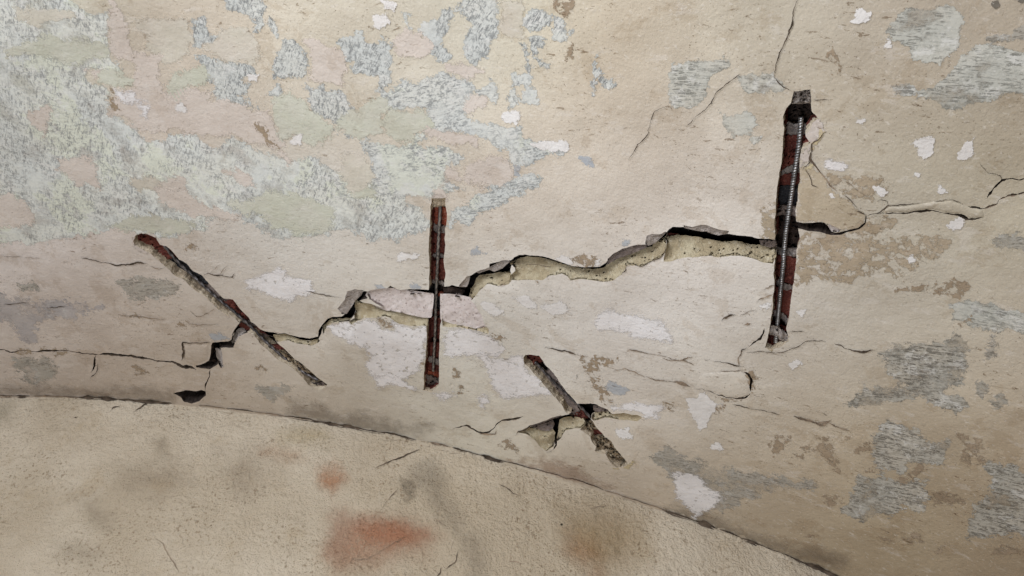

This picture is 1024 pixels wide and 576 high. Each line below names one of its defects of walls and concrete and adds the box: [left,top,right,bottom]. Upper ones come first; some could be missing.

peeling [0,0,574,255]
peeling [667,56,786,109]
crack [774,1,797,90]
peeling [885,4,1024,110]
crack [84,258,162,269]
flaking render [273,202,776,346]
crack [265,134,1024,341]
crack [0,309,838,576]
flaking render [497,355,642,453]
crack [616,285,871,431]
peeling [649,420,1024,555]